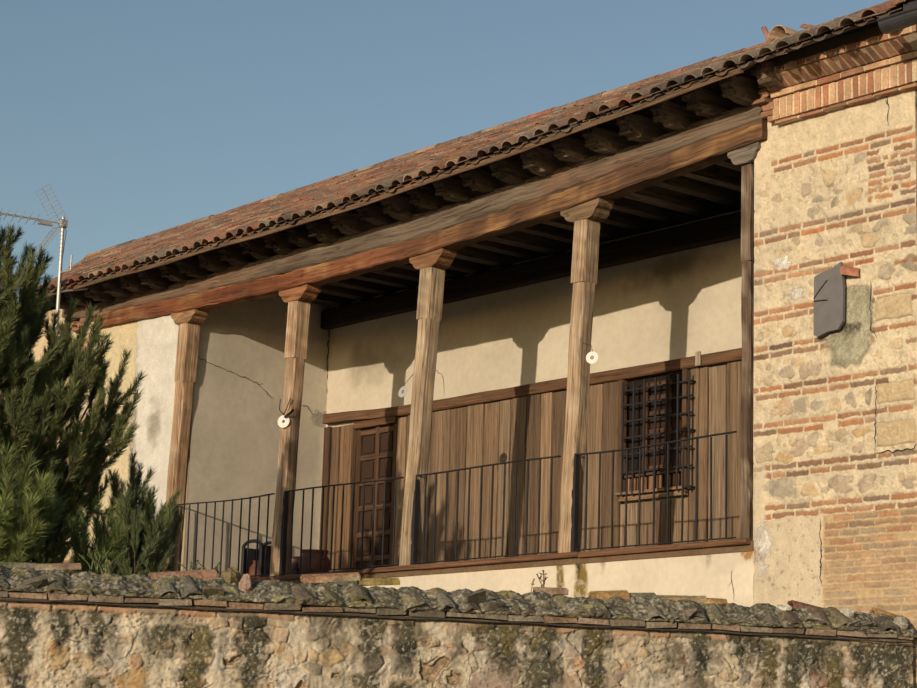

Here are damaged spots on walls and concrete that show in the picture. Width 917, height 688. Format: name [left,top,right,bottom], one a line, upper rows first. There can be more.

crack [198,356,274,399]
crack [873,386,917,457]
crack [816,520,824,586]
damp [0,608,36,688]
damp [49,610,72,644]
damp [83,610,112,660]
damp [146,625,213,688]
damp [233,616,269,688]
damp [352,618,417,688]
damp [467,624,561,688]
damp [581,628,607,688]
damp [726,634,917,688]